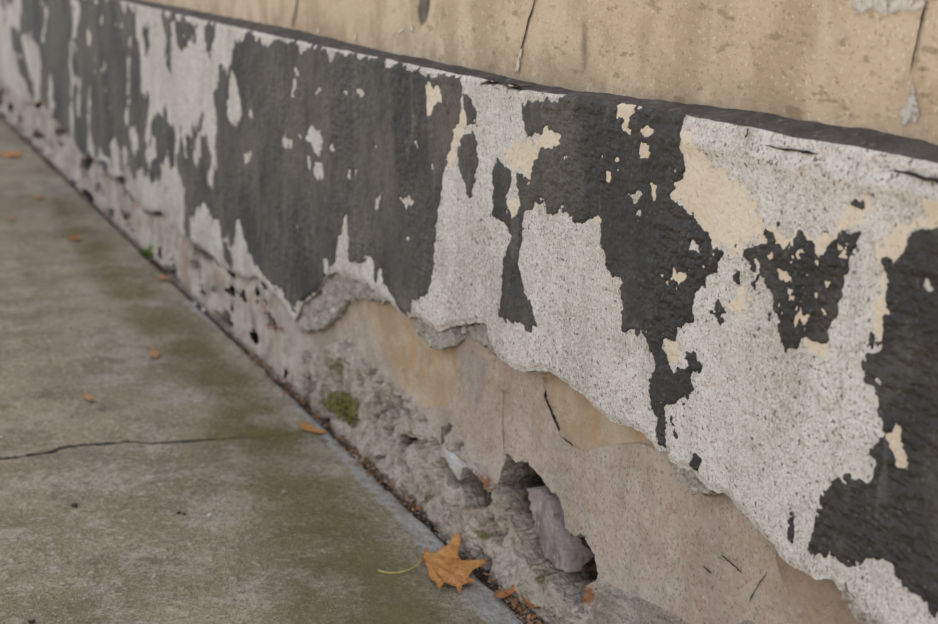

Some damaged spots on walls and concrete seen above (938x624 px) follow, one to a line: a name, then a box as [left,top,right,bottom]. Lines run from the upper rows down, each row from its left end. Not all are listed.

crack [516,0,535,72]
crack [910,0,927,73]
spalling [0,0,537,590]
peeling [407,67,938,624]
crack [0,430,307,459]
crack [539,375,573,446]